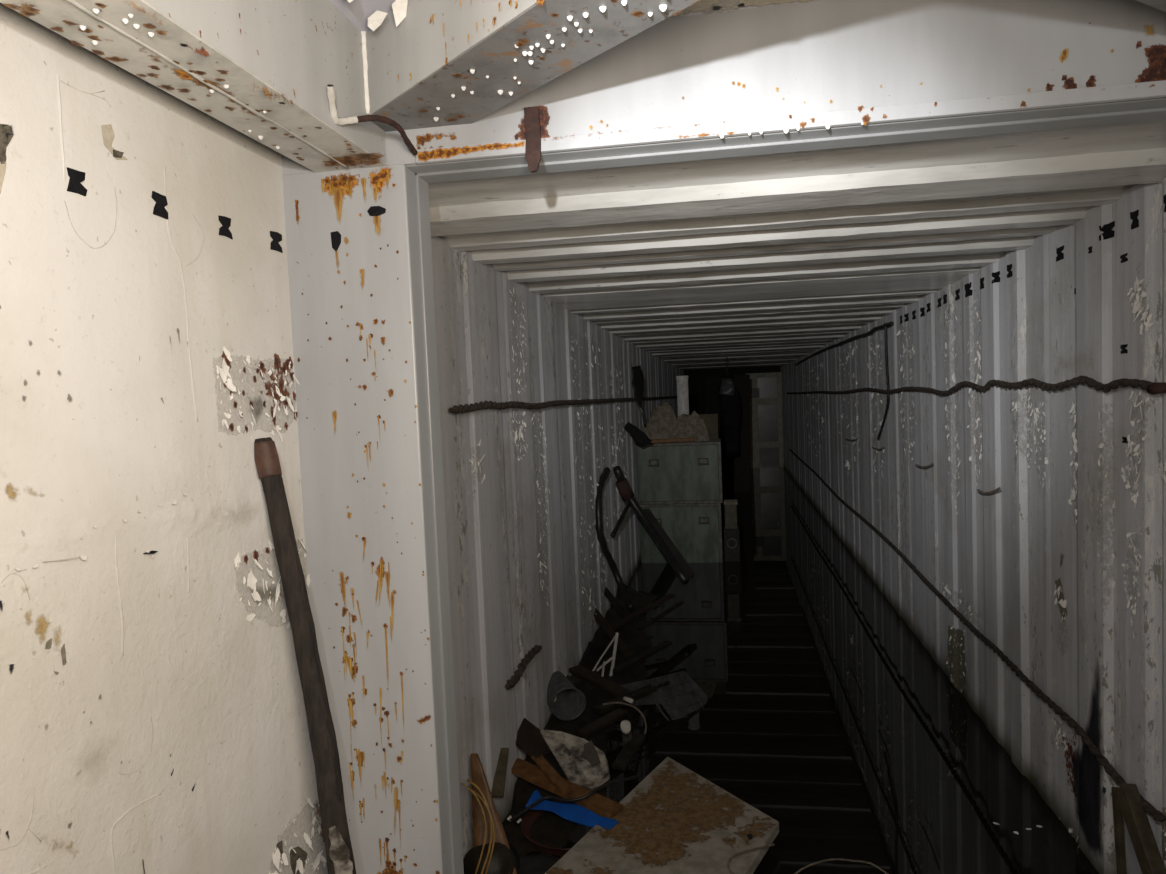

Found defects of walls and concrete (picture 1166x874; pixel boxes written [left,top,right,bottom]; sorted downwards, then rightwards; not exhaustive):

spalling [0,124,13,193]
corrosion [50,20,128,62]
corrosion [136,30,321,161]
peeling [368,0,408,31]
corrosion [416,115,526,161]
corrosion [538,105,557,140]
corrosion [1135,26,1166,86]
corrosion [340,305,390,390]
peeling [216,346,300,442]
peeling [234,540,290,629]
corrosion [329,535,431,874]
peeling [269,794,326,874]